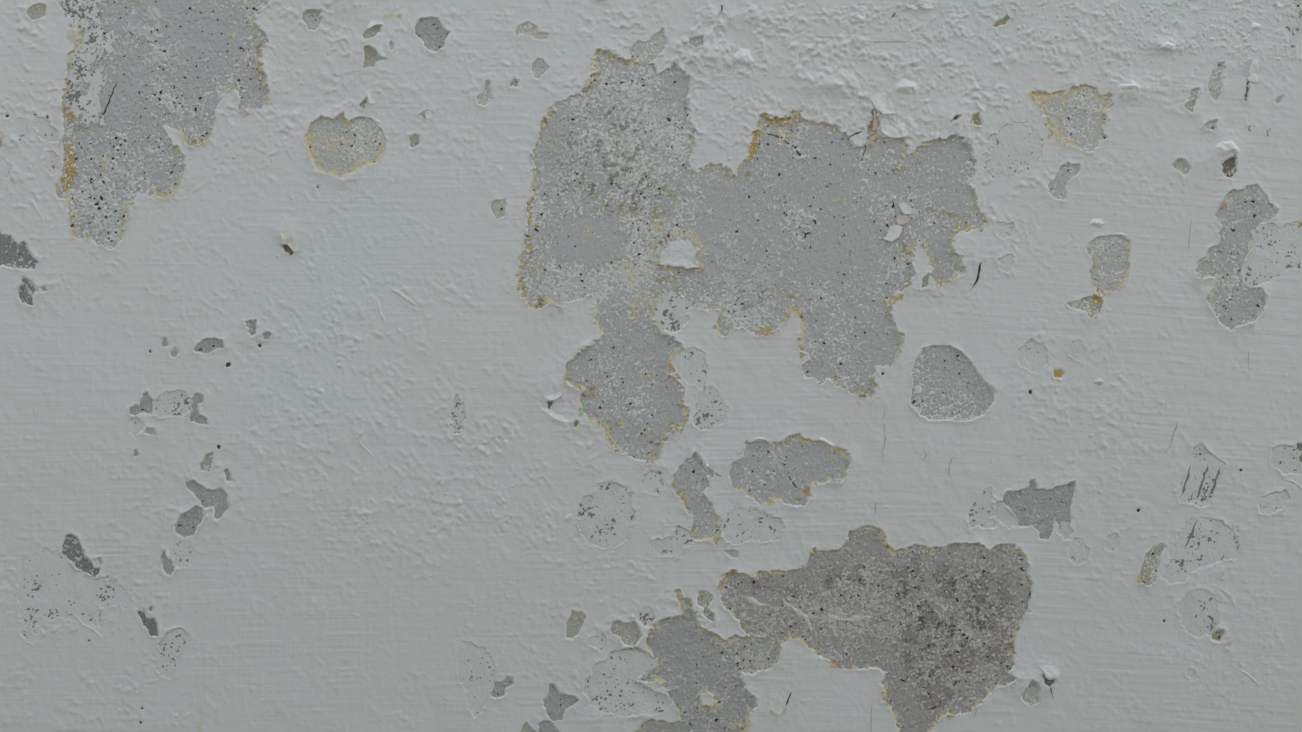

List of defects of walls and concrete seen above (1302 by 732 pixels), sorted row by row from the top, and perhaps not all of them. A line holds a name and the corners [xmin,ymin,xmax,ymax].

peeling [34,0,269,249]
peeling [306,92,384,176]
peeling [1033,86,1111,200]
peeling [0,233,46,305]
peeling [519,29,994,463]
peeling [1067,236,1130,318]
peeling [1195,157,1277,330]
peeling [130,393,155,435]
peeling [1003,480,1075,540]
peeling [566,612,586,639]
peeling [611,435,1061,732]
peeling [521,678,589,732]